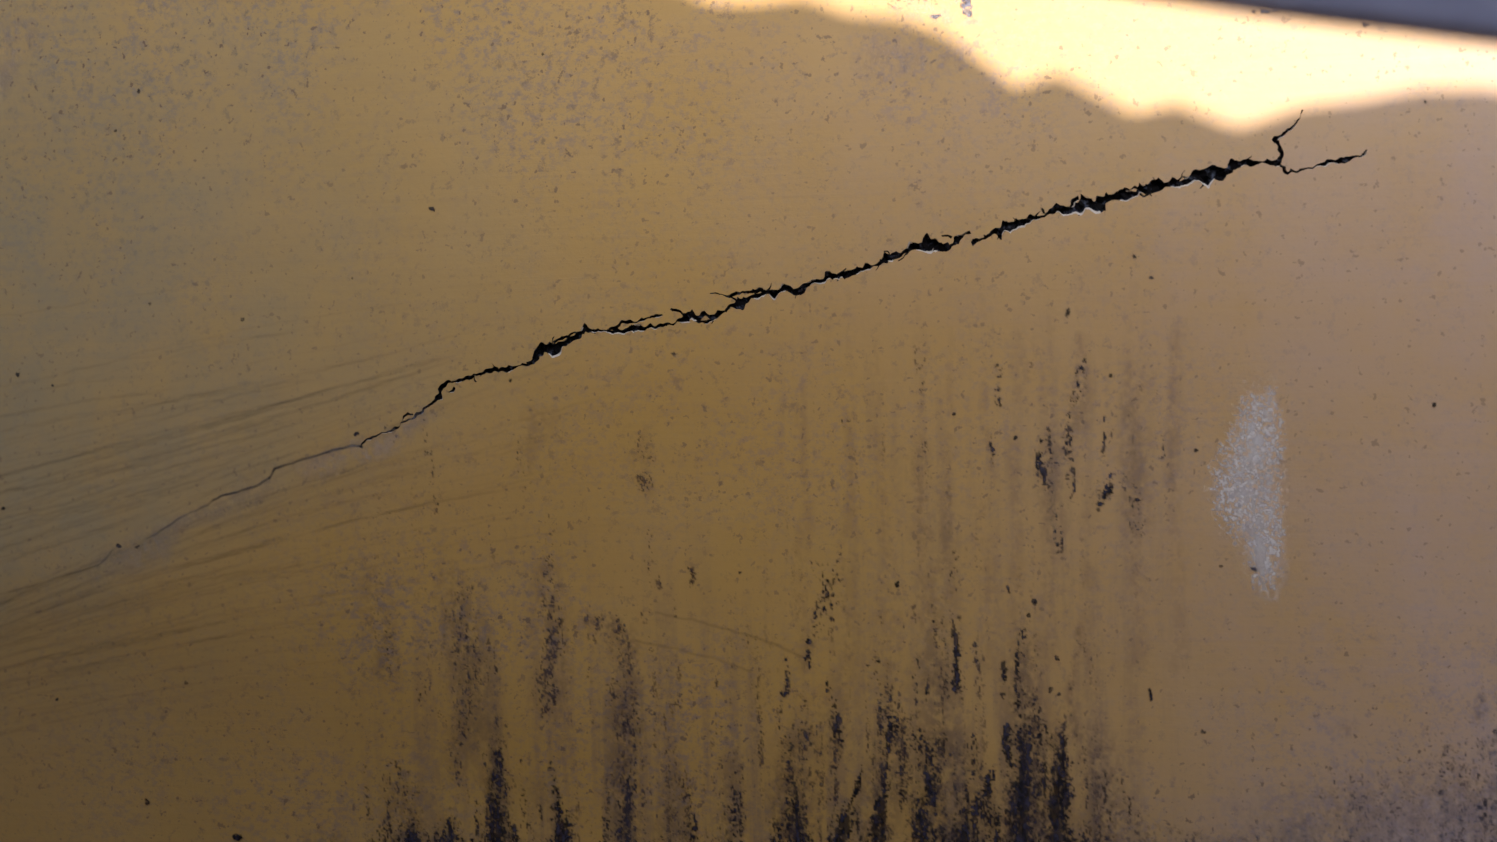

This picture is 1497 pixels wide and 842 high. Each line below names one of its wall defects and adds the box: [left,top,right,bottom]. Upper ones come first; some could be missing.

peeling [961,0,972,17]
crack [213,110,1367,501]
water stain [1036,359,1086,499]
water stain [1097,473,1140,511]
water stain [365,717,580,842]
water stain [539,554,565,718]
water stain [585,615,677,842]
water stain [719,554,1139,842]